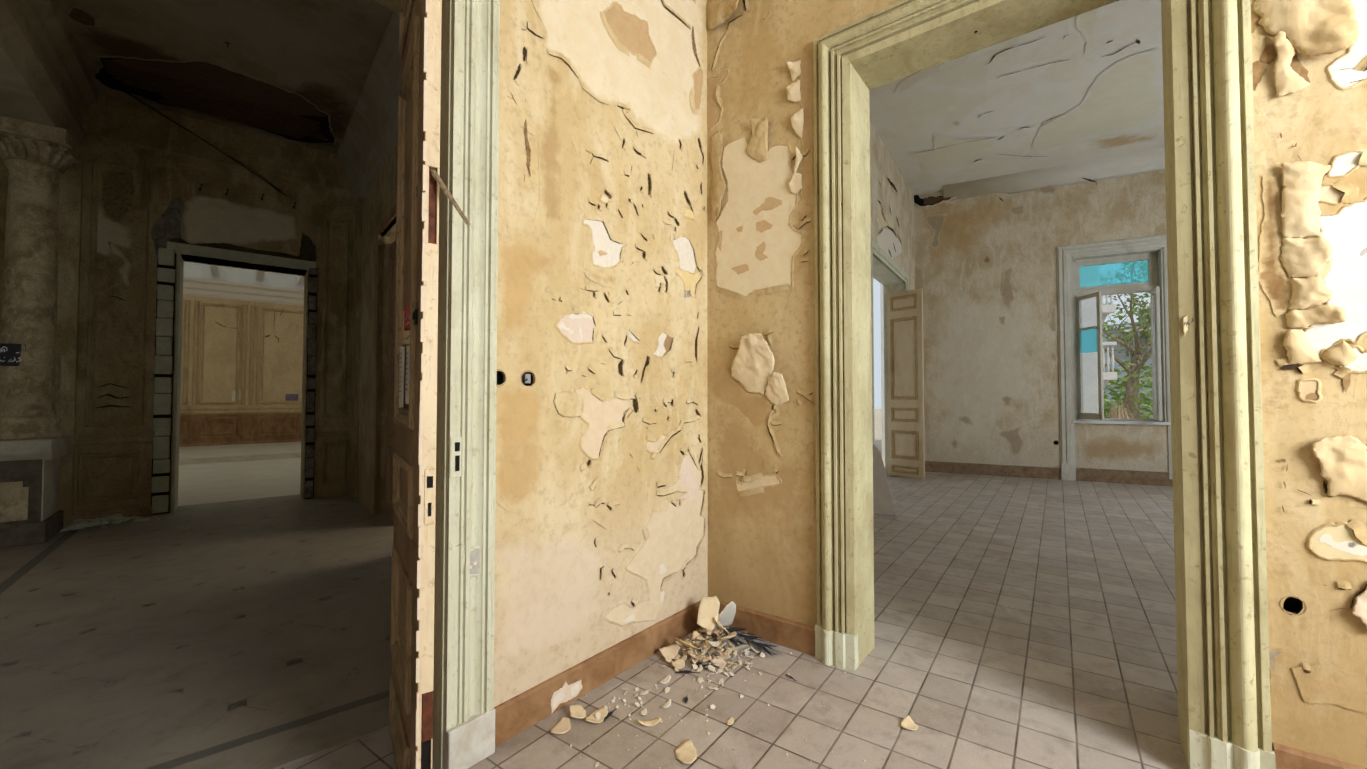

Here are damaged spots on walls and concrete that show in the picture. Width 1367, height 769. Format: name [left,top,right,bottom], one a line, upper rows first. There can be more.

flaking render [91,167,317,289]
peeling [531,0,730,148]
crack [506,0,815,607]
peeling [653,60,805,301]
crack [914,111,1059,162]
crack [986,35,1140,78]
peeling [1277,149,1367,378]
peeling [1324,0,1367,92]
peeling [711,333,789,428]
peeling [603,450,707,627]
peeling [1305,436,1367,564]
peeling [1352,586,1367,628]